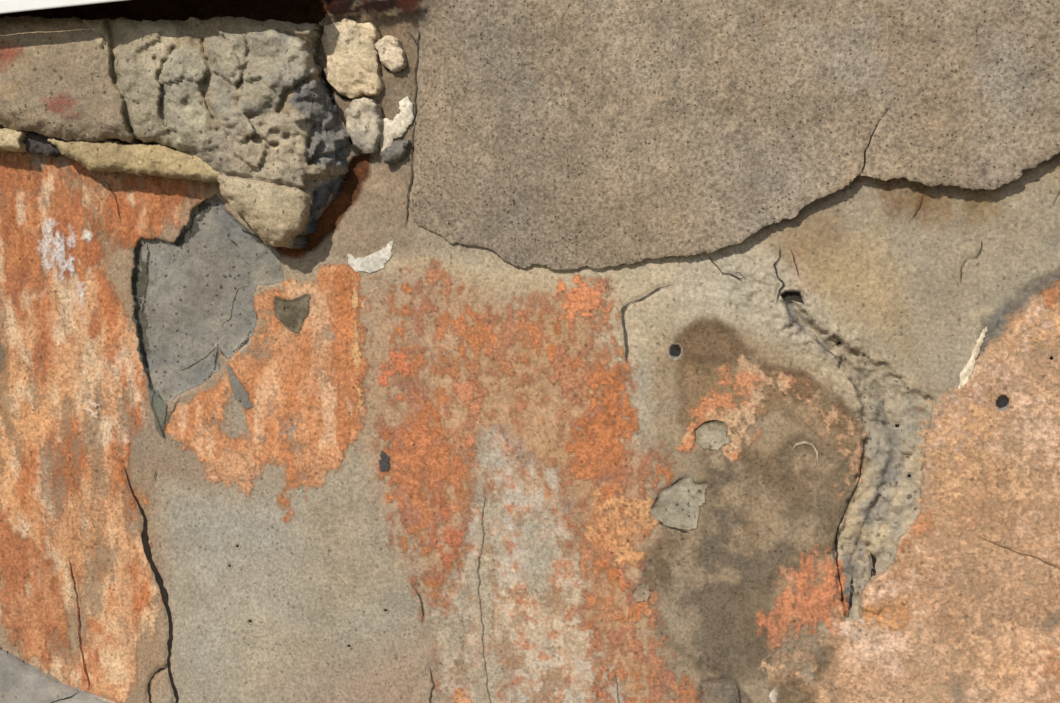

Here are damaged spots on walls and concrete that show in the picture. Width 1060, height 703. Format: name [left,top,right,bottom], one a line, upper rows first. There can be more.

flaking render [320,18,414,164]
crack [51,558,89,703]
crack [123,464,178,703]
crack [151,394,179,439]
peeling [0,151,707,703]
water stain [640,319,862,703]
crack [835,434,867,606]
peeling [676,279,1060,703]